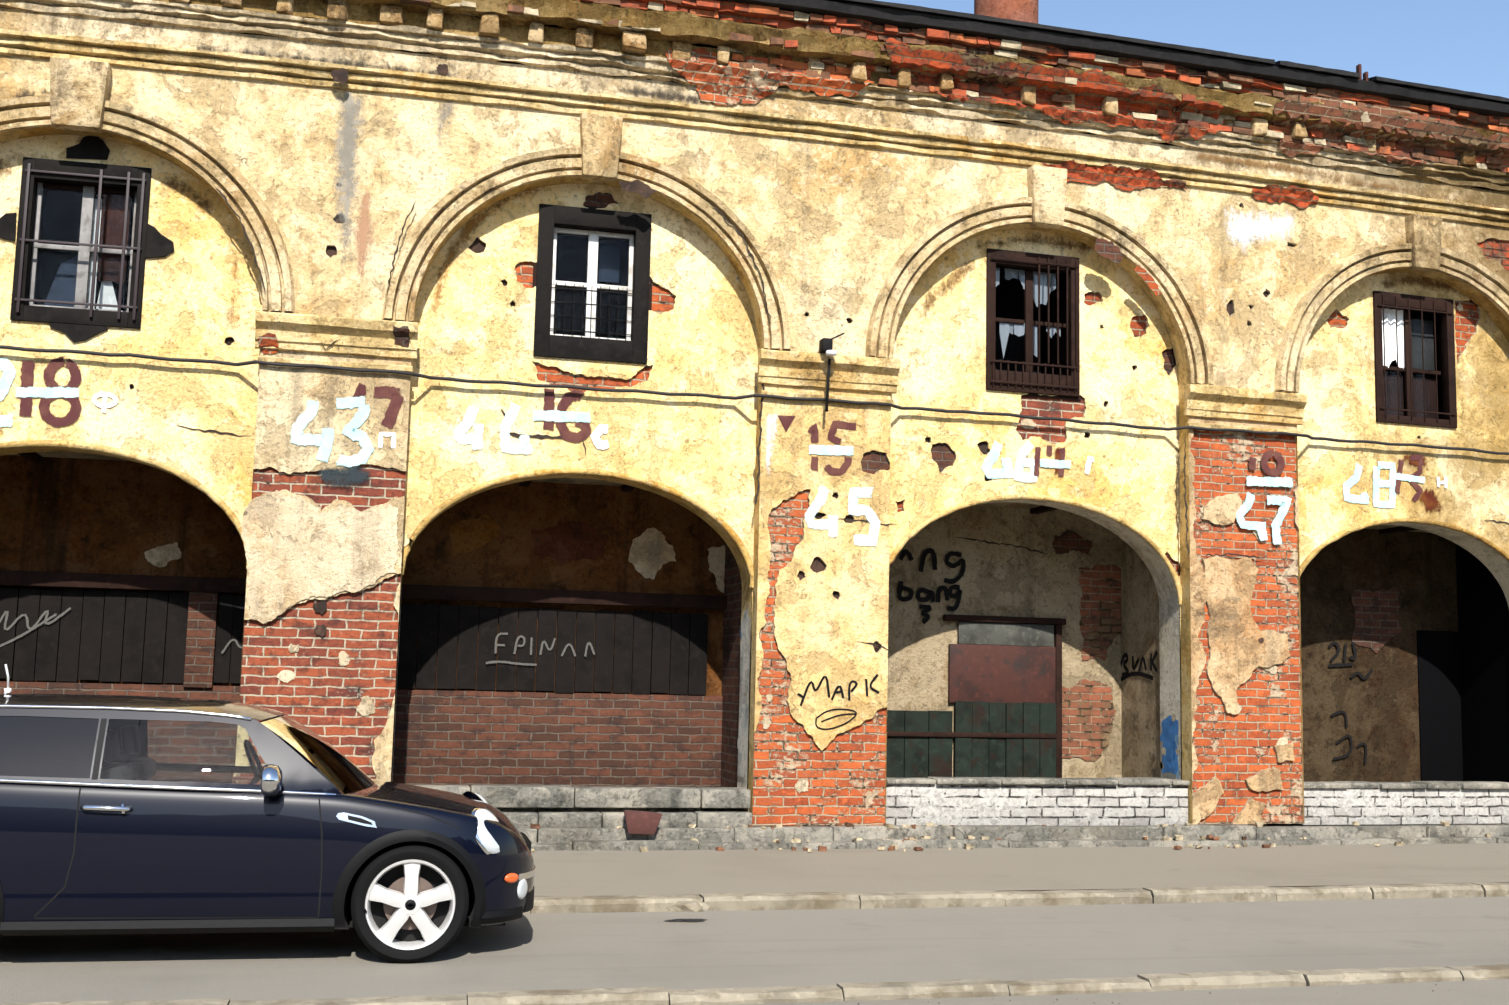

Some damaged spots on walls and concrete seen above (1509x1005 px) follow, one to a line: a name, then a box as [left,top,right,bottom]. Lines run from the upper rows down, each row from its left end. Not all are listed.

spalling [501,261,537,307]
spalling [651,278,676,314]
spalling [1476,238,1509,271]
spalling [1454,300,1481,364]
spalling [532,361,653,392]
spalling [1016,396,1090,444]
spalling [252,464,406,511]
spalling [239,573,401,779]
spalling [737,489,886,825]
spalling [1052,530,1122,661]
spalling [1160,429,1303,824]
spalling [1062,679,1116,761]